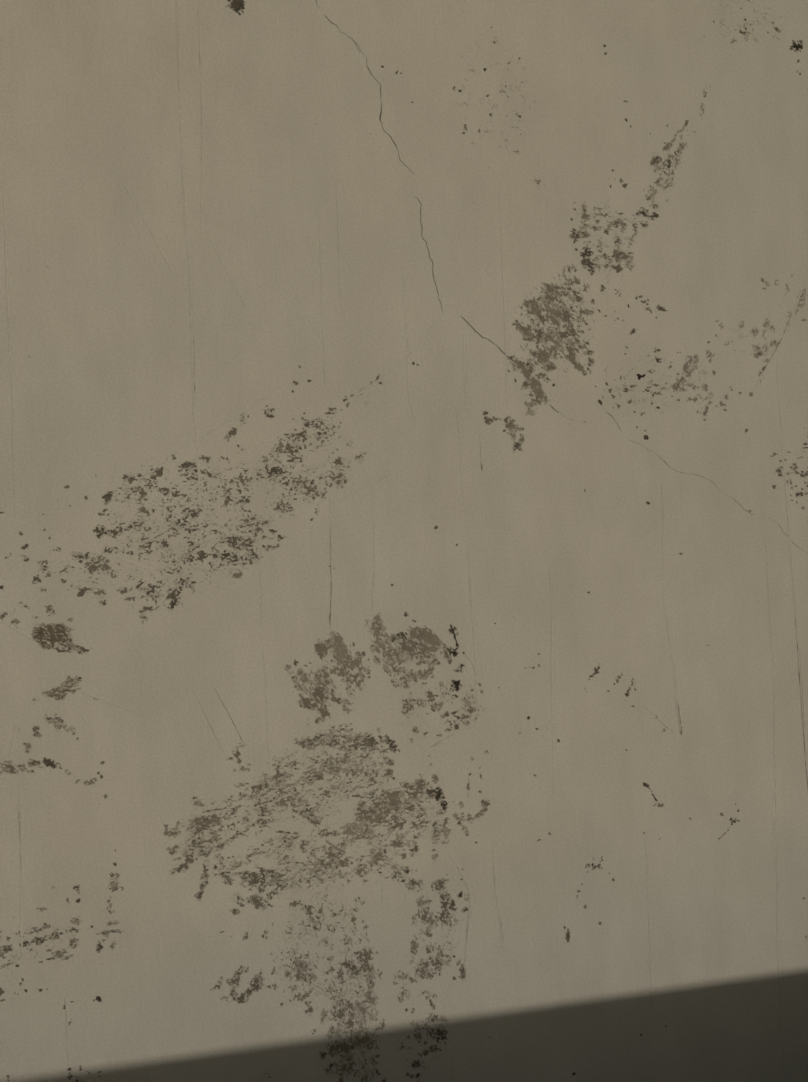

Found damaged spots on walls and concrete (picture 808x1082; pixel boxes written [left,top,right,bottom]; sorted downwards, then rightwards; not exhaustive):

spalling [224,0,247,16]
crack [316,0,517,365]
peeling [482,34,808,454]
peeling [0,373,383,655]
crack [549,404,808,553]
peeling [769,427,808,510]
peeling [0,714,109,799]
peeling [27,675,99,706]
peeling [162,610,500,1082]
peeling [0,849,124,1002]